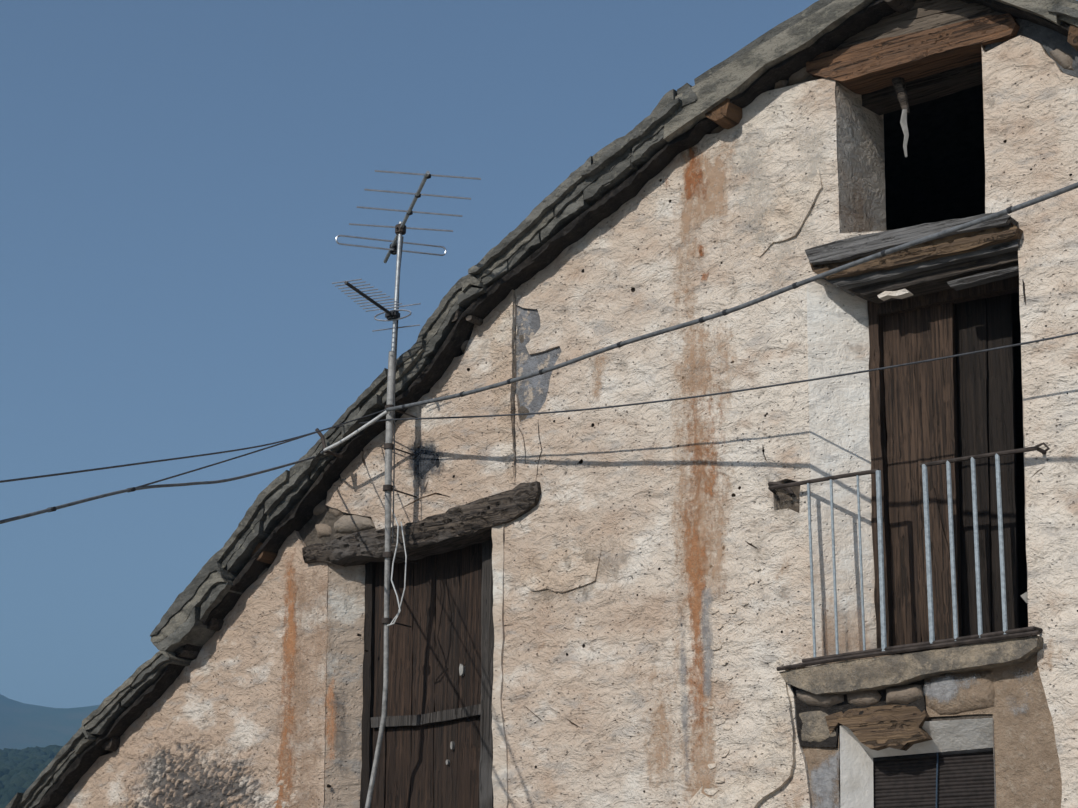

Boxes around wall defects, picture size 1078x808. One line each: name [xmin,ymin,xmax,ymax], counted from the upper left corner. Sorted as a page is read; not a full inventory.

corrosion [679,148,733,265]
peeling [490,289,562,483]
corrosion [675,328,729,797]
corrosion [283,567,297,687]
mould [83,706,299,808]
corrosion [275,709,294,808]
spalling [690,591,1062,808]